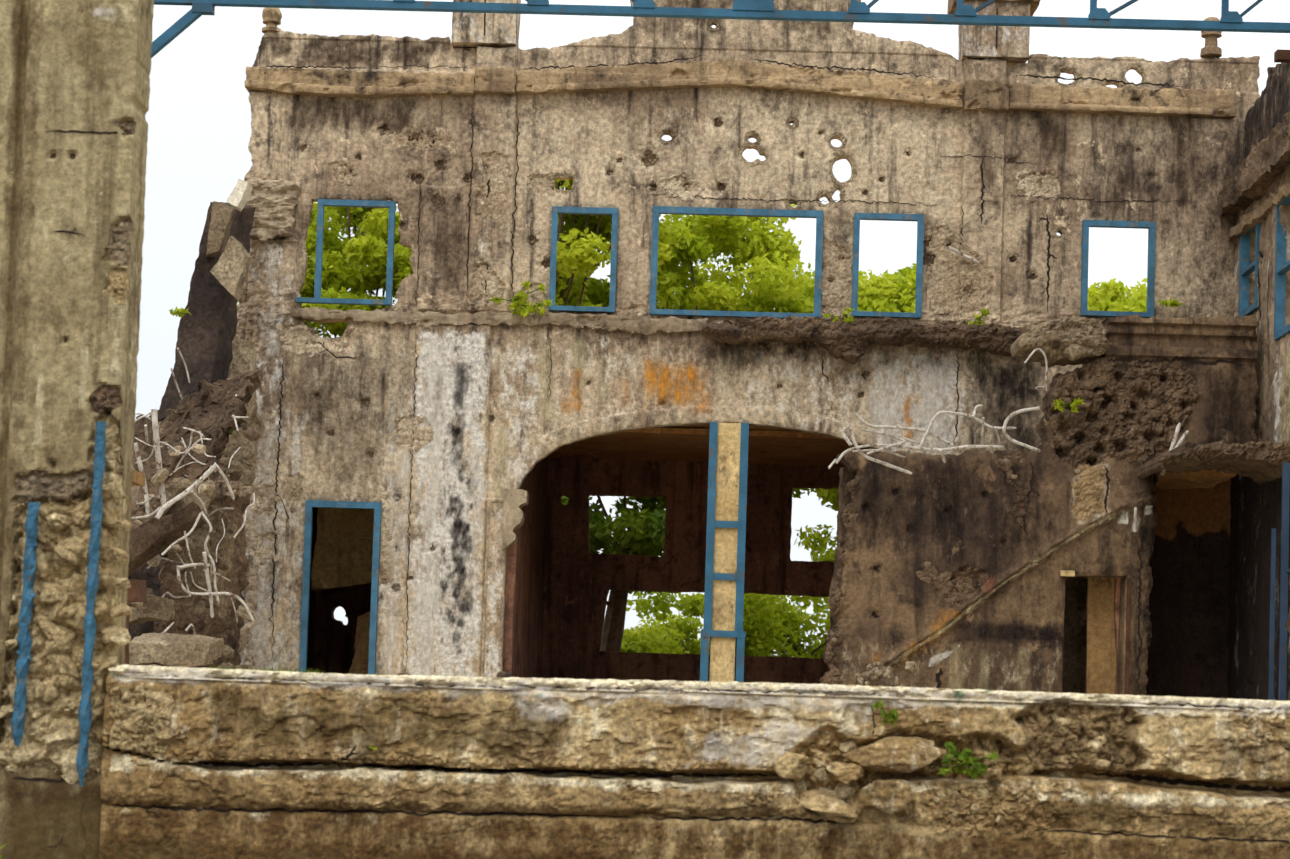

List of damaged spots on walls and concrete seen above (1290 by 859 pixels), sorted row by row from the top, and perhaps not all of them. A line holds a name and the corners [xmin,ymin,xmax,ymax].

spalling [170,348,190,399]
corrosion [646,363,704,402]
spalling [828,314,1290,610]
water stain [284,340,564,717]
spalling [0,384,304,786]
crack [1133,533,1290,710]
spalling [821,630,841,685]
crack [1093,773,1290,793]
spalling [1193,804,1290,833]